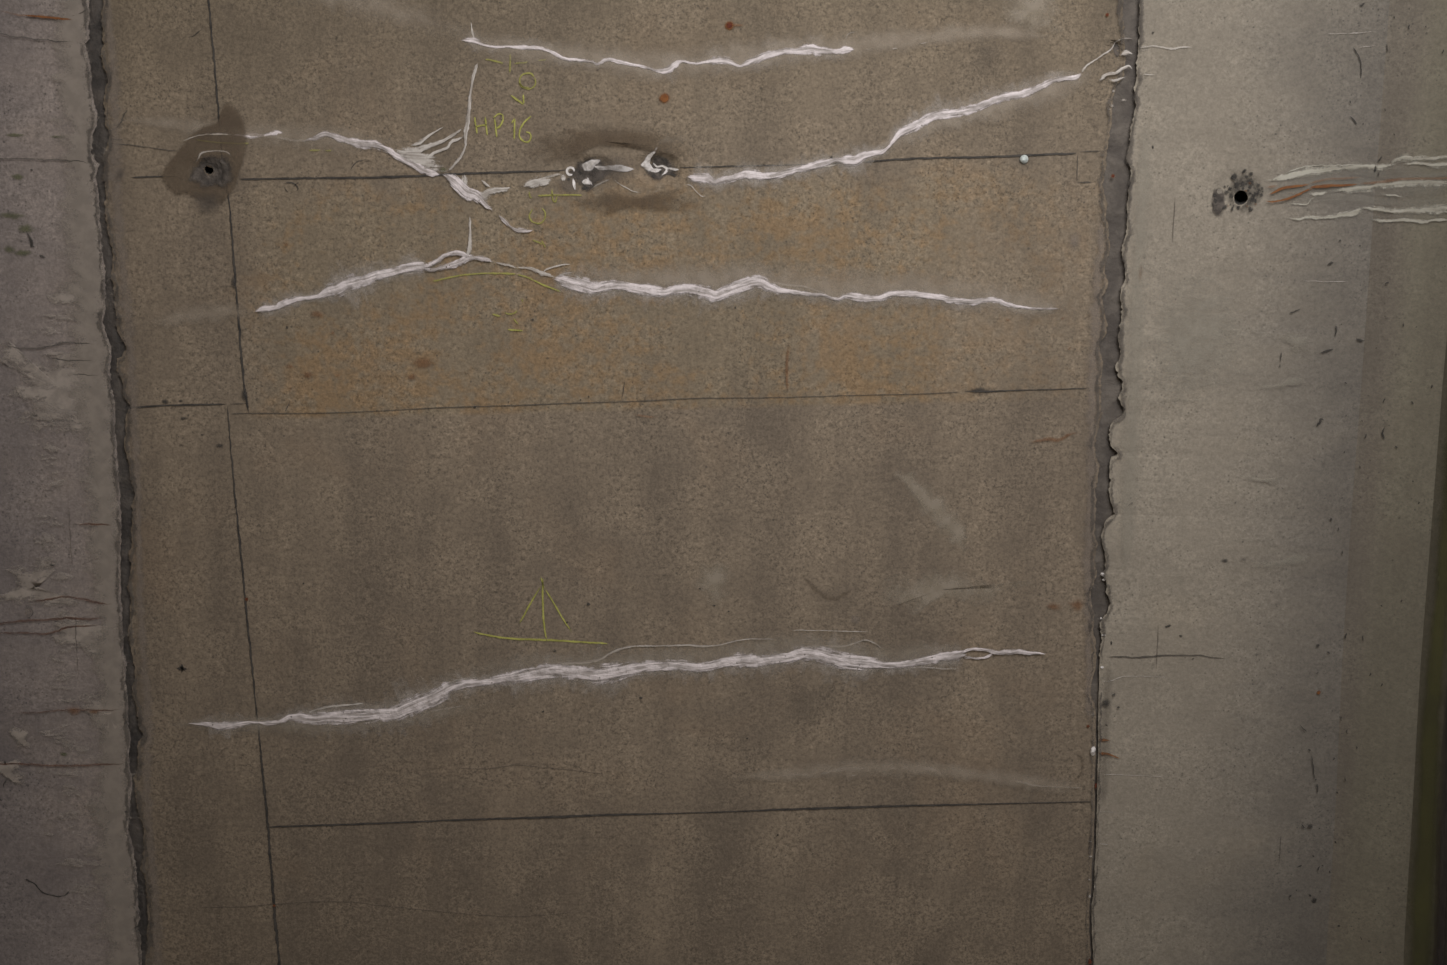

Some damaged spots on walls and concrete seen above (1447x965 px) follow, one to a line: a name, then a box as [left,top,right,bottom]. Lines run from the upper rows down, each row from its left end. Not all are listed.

leakage [463,0,1047,78]
leakage [140,65,565,233]
leakage [594,180,673,210]
leakage [256,218,1057,316]